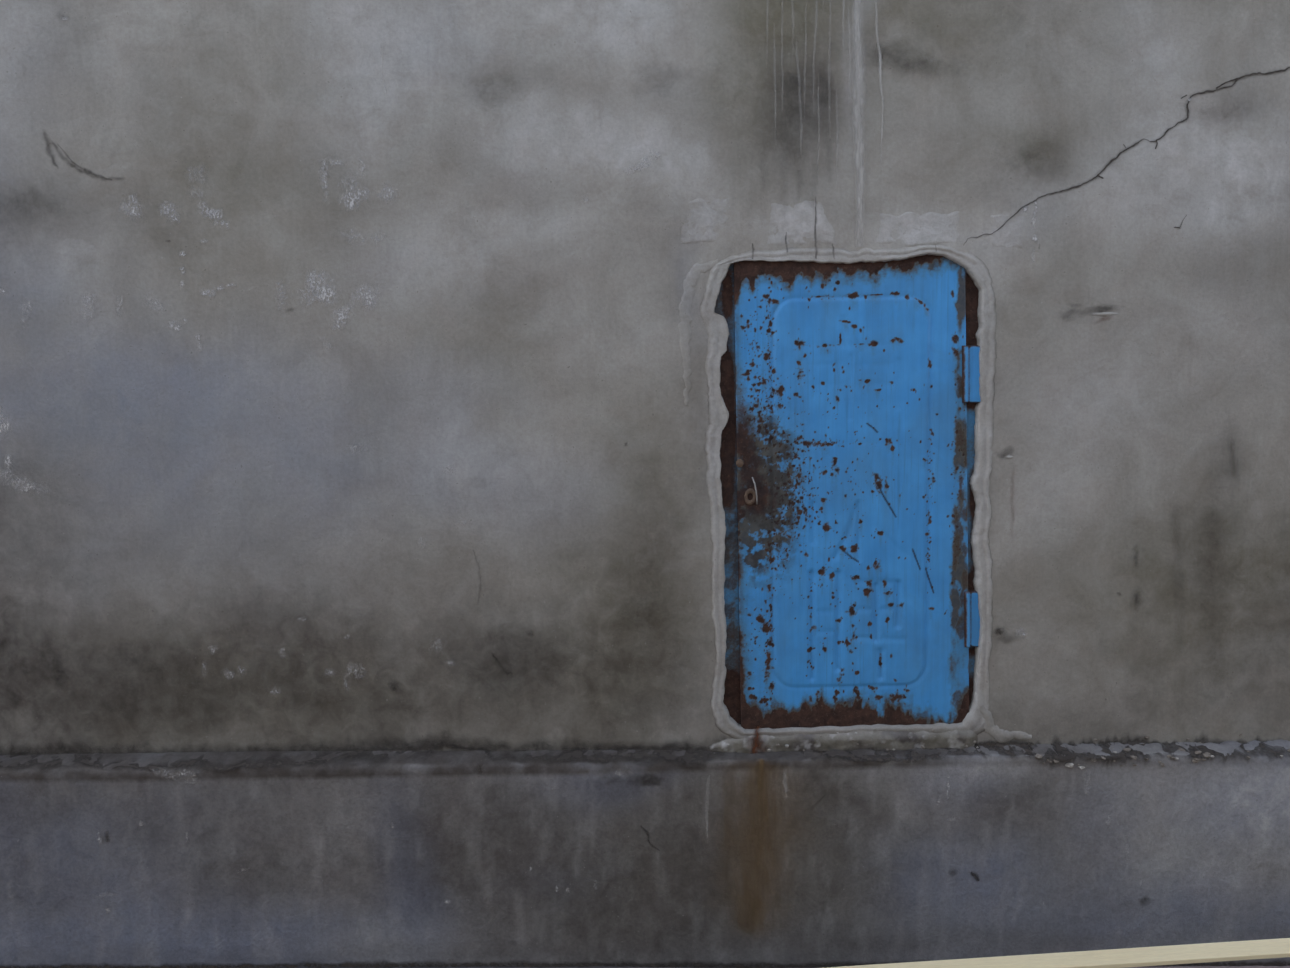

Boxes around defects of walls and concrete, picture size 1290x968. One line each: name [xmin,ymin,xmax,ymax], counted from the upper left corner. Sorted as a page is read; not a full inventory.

leakage [843,0,883,247]
crack [964,67,1290,244]
spalling [1028,734,1290,770]